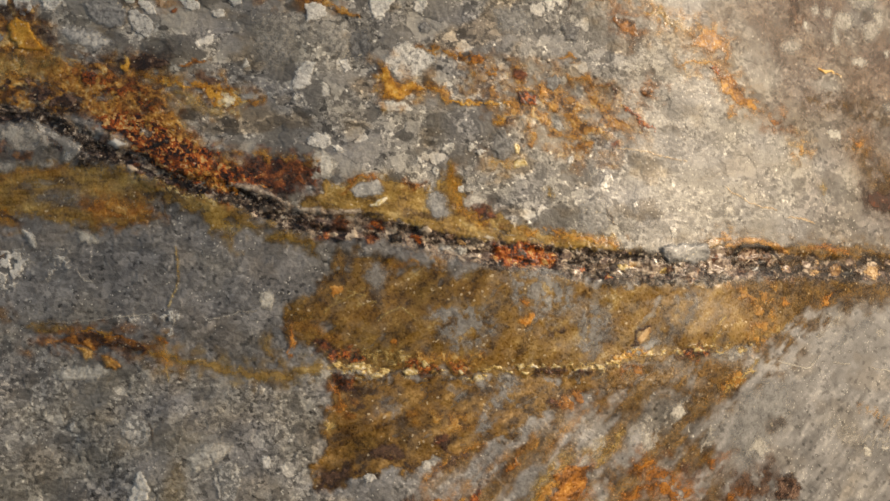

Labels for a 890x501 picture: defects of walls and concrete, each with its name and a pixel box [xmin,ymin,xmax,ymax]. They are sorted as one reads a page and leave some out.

corrosion [0,0,321,198]
corrosion [375,44,655,153]
corrosion [682,24,758,117]
damp [0,161,318,255]
crack [0,102,890,288]
crack [23,247,180,328]
corrosion [27,322,332,382]
crack [300,316,752,391]
corrosion [609,341,758,410]
corrosion [536,434,621,501]
damp [469,377,722,501]
corrosion [609,459,695,501]